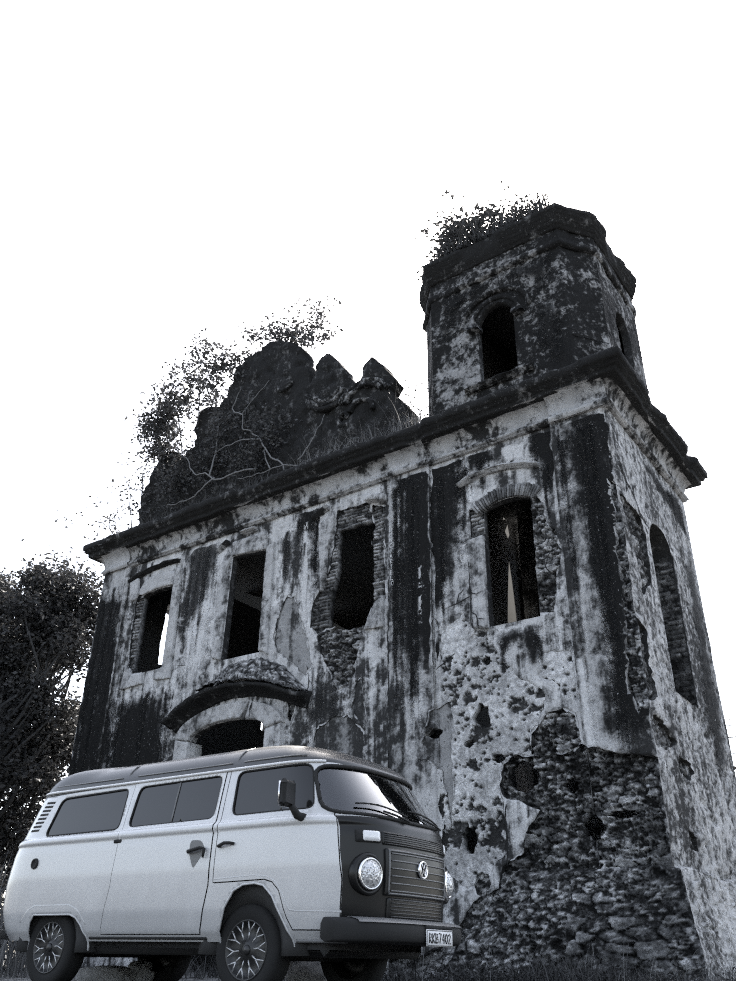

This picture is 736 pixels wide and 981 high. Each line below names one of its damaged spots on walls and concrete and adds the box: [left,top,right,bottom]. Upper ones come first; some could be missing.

damp [69,587,167,776]
damp [182,545,217,674]
spalling [195,503,386,757]
spalling [469,505,489,543]
damp [392,413,649,746]
spalling [530,497,562,612]
spalling [421,613,673,943]
spalling [610,481,653,711]